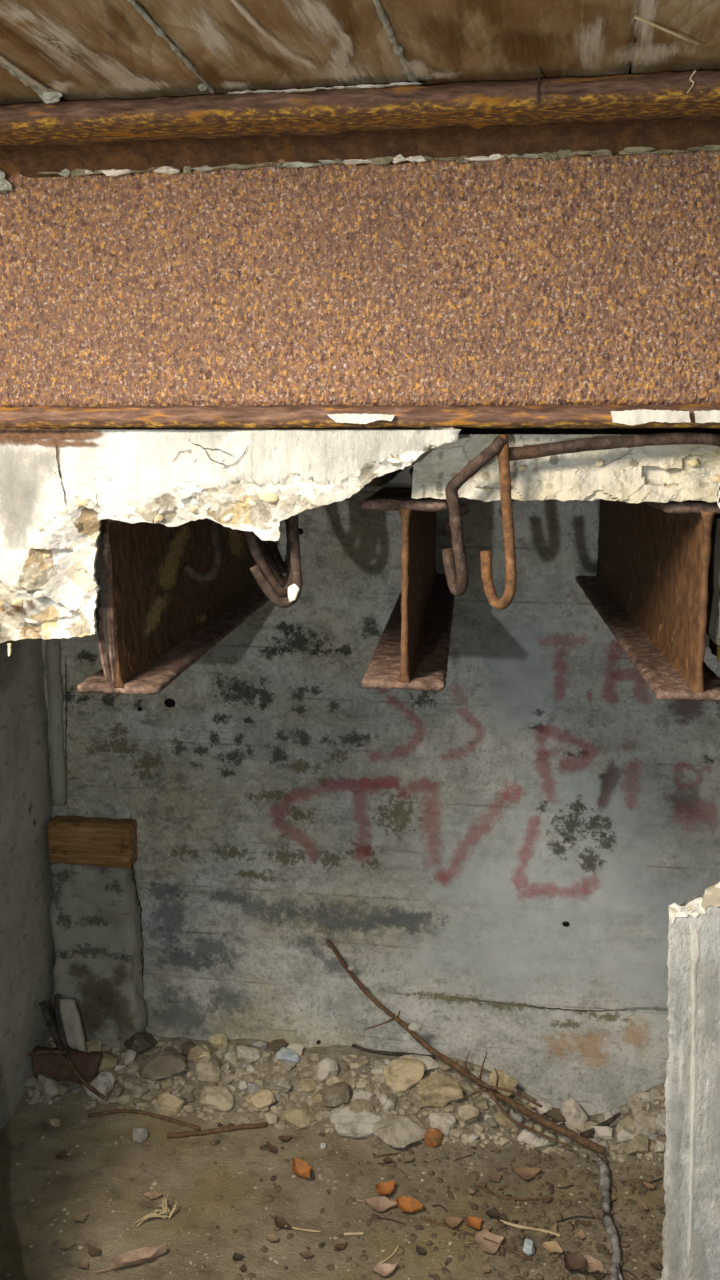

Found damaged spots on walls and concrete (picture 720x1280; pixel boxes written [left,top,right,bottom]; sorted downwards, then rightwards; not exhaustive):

corrosion [229,527,245,560]
spalling [0,409,720,657]
corrosion [145,526,190,634]
corrosion [96,533,117,691]
damp [252,621,351,659]
damp [64,687,120,709]
damp [410,690,436,708]
damp [86,674,379,786]
damp [246,788,316,824]
damp [373,787,422,839]
spalling [668,882,720,923]
crack [451,997,668,1012]